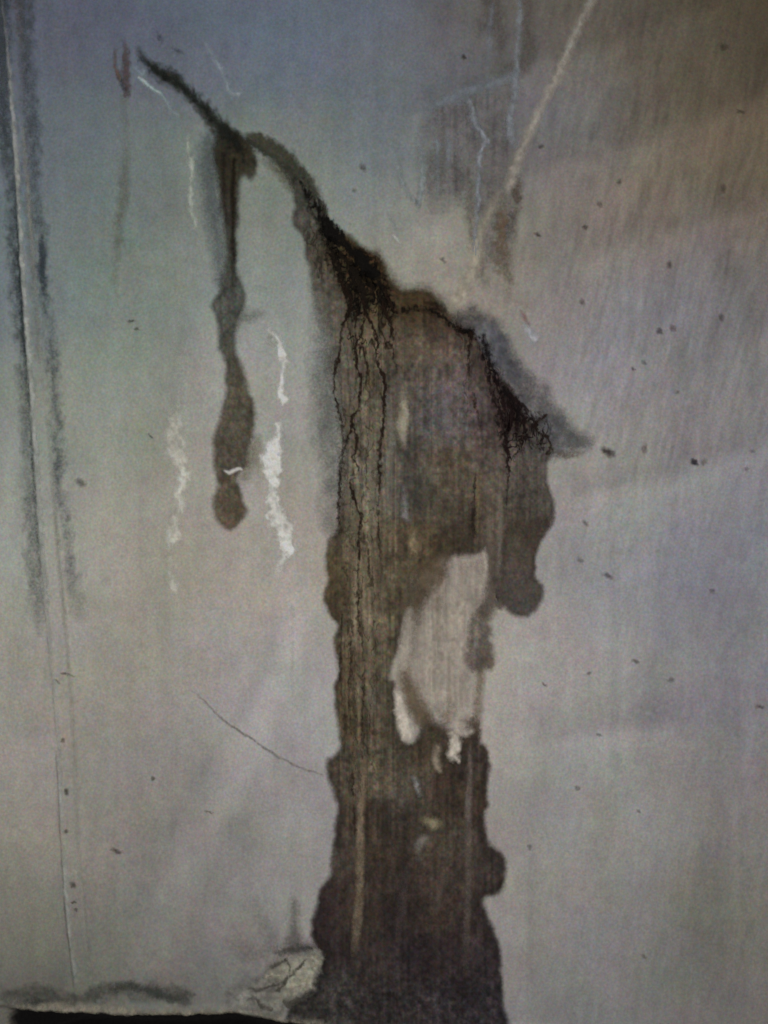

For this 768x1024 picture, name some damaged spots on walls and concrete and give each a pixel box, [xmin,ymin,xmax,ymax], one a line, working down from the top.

leakage [0,0,32,352]
leakage [37,244,47,295]
efflorescence [167,415,191,553]
leakage [186,127,295,572]
crack [143,56,583,717]
leakage [284,171,585,1024]